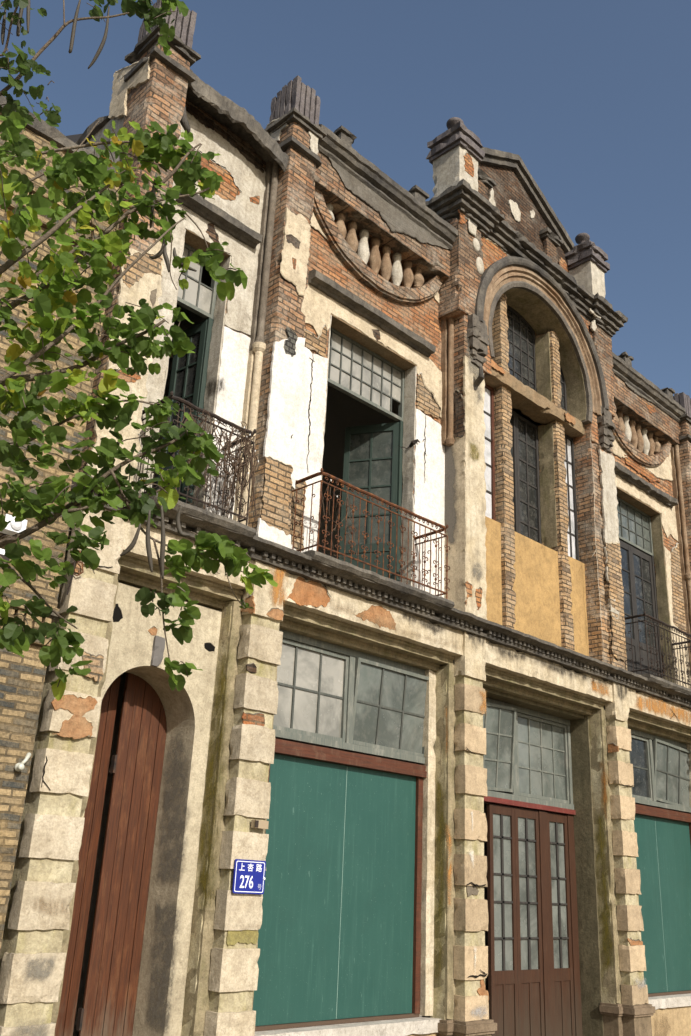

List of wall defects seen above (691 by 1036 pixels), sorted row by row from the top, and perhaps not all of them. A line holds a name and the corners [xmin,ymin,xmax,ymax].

spalling [178,138,260,204]
peeling [280,208,336,296]
crack [291,352,315,467]
spalling [416,372,441,419]
spalling [455,390,465,438]
spalling [260,456,307,551]
spalling [240,576,330,621]
spalling [354,604,396,630]
spalling [51,693,98,740]
damp [158,737,189,882]
damp [199,656,227,904]
damp [596,817,612,970]